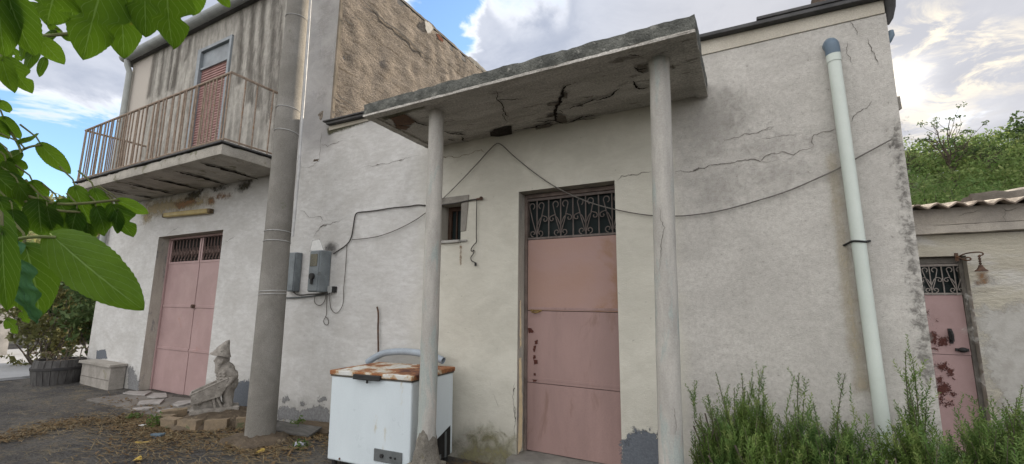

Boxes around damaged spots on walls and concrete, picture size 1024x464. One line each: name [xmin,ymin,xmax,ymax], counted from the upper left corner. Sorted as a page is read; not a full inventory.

spalling [382,106,425,130]
crack [496,55,648,131]
crack [676,102,871,172]
rust [926,311,957,408]